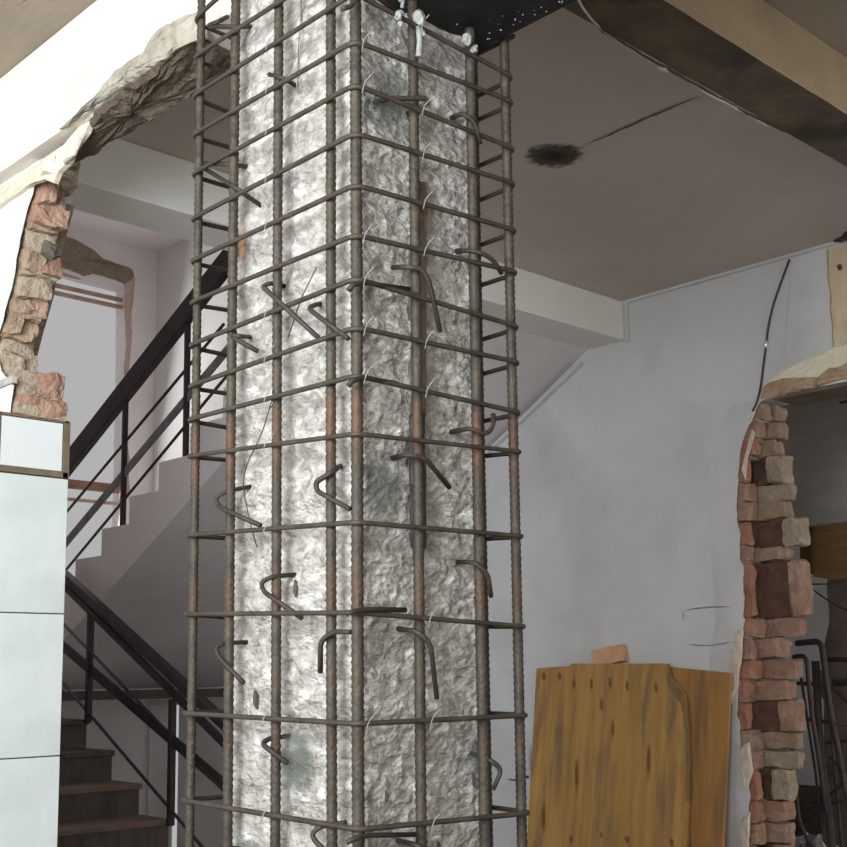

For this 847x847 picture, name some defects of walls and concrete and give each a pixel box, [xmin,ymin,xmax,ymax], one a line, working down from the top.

crack [577,0,802,146]
flaking render [0,12,231,422]
water stain [527,144,582,167]
flaking render [708,231,847,847]
crack [683,606,731,619]